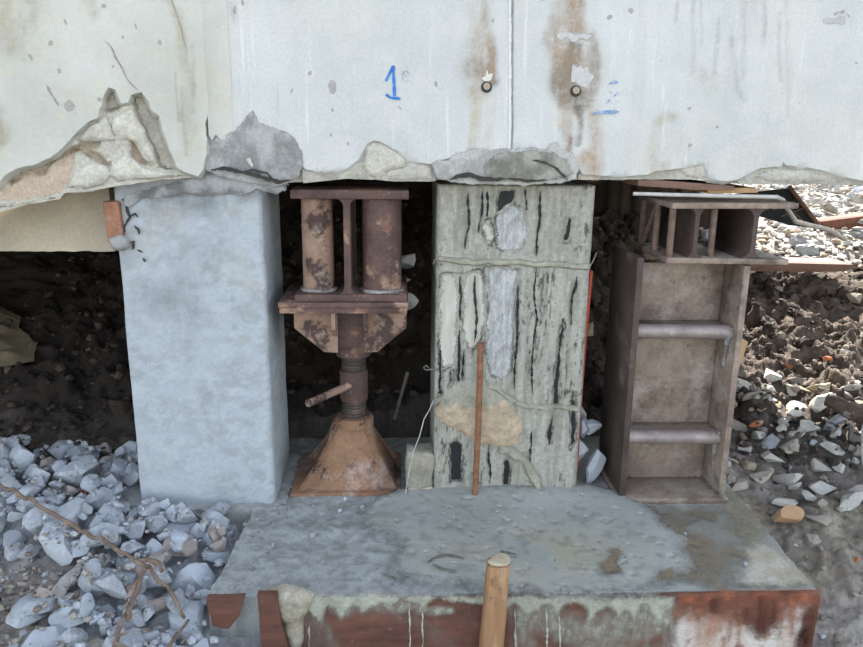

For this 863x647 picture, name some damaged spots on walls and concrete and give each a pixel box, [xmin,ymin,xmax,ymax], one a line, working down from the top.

corrosion [473,40,496,85]
crack [507,0,515,149]
corrosion [552,0,599,125]
spalling [0,97,192,212]
spalling [302,142,436,183]
spalling [103,199,125,243]
crack [450,160,568,394]
crack [563,218,571,240]
crack [438,276,478,394]
crack [487,277,578,484]
crack [450,441,462,480]